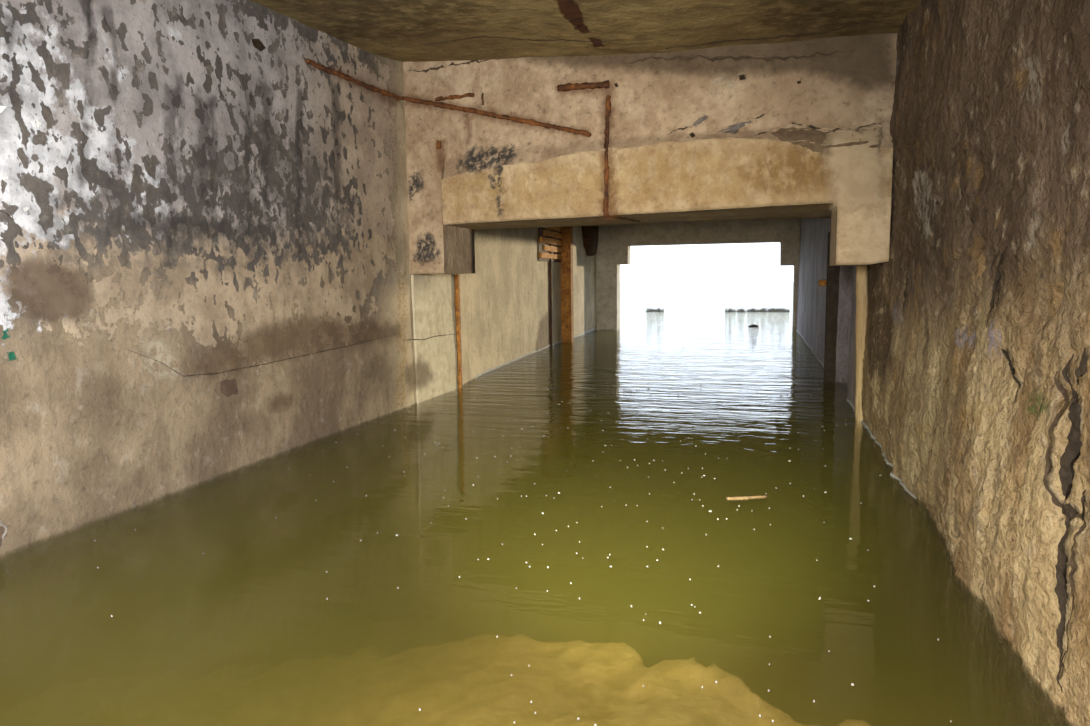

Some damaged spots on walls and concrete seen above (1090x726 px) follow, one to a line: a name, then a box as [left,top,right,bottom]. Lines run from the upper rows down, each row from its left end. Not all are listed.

corrosion [557,0,603,47]
peeling [0,0,399,376]
damp [7,261,89,318]
crack [986,246,1007,327]
spalling [220,368,238,397]
crack [1001,349,1021,403]
crack [1043,347,1088,692]